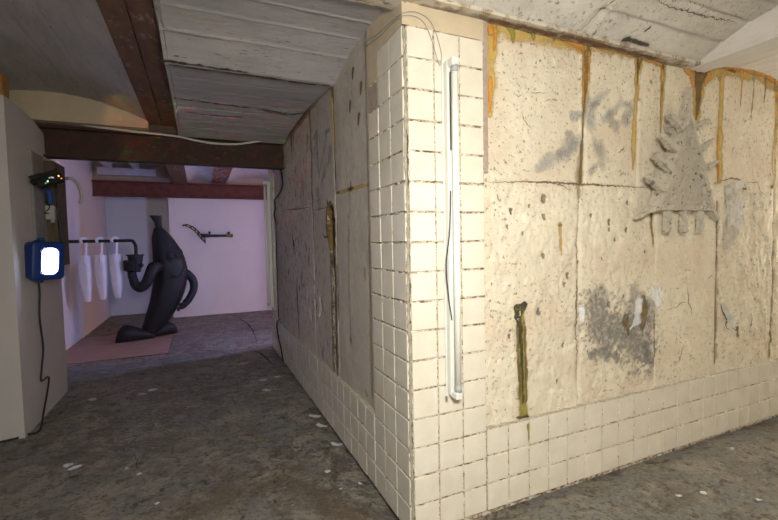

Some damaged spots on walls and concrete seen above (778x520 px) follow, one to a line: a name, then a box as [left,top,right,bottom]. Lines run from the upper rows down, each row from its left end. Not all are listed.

corrosion [487,23,666,170]
corrosion [707,67,778,188]
crack [288,137,340,376]
flaking render [578,287,660,378]
damp [630,285,662,329]